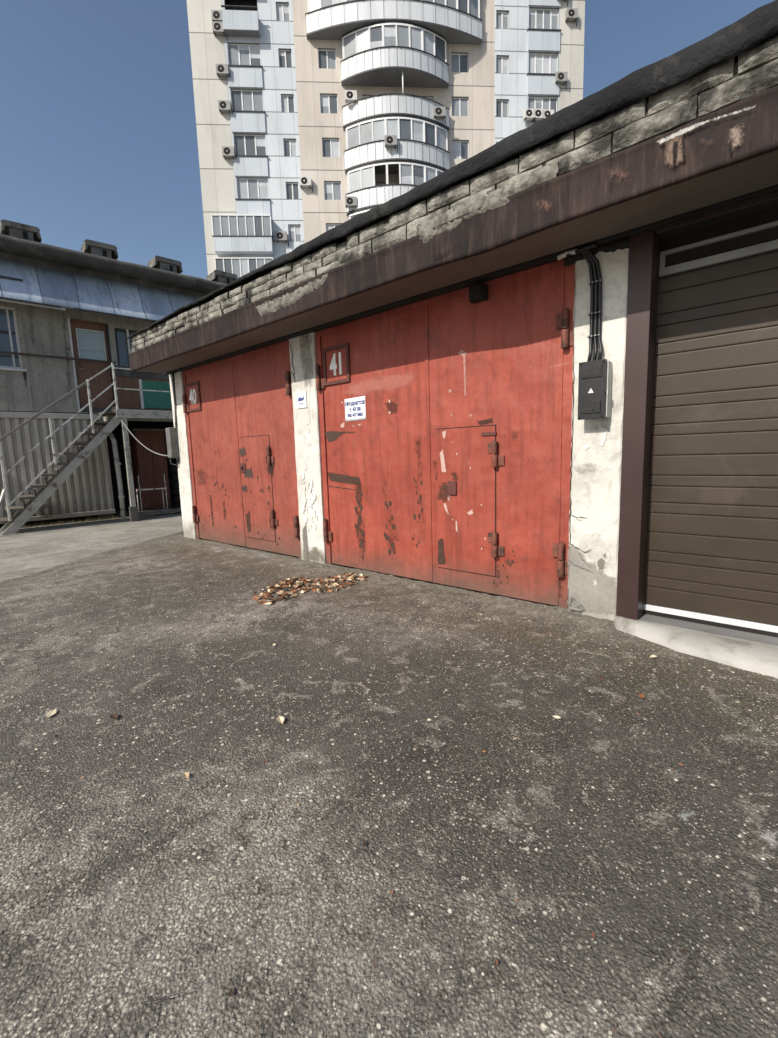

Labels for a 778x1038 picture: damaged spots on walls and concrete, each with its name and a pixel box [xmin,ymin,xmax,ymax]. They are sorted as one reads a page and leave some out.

peeling [729,128,743,146]
peeling [440,431,458,472]
peeling [302,473,318,561]
corrosion [328,473,365,548]
peeling [593,550,610,585]